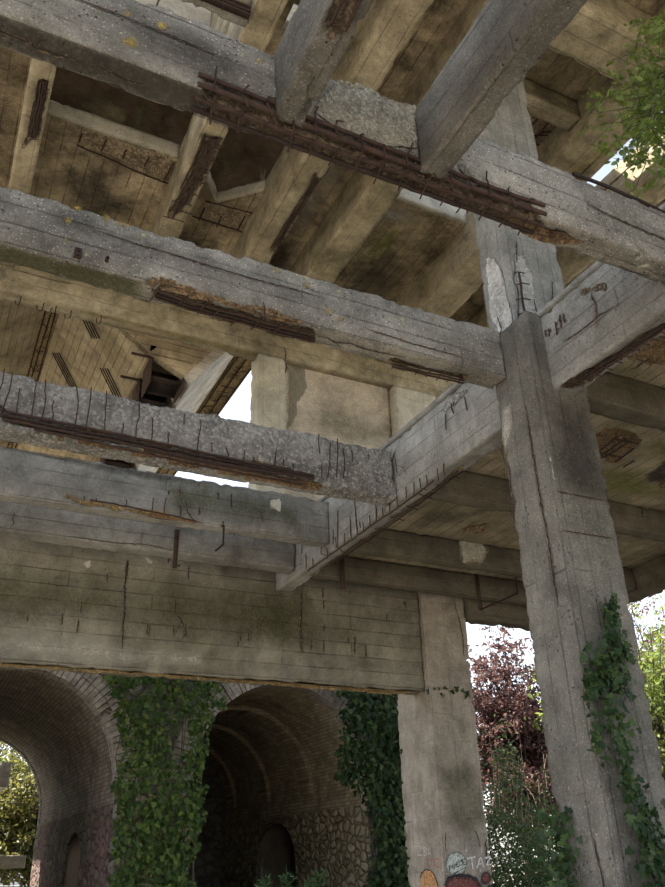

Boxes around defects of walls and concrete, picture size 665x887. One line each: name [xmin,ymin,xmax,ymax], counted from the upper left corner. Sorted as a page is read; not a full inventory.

spalling [324,0,362,40]
spalling [163,66,584,251]
spalling [146,277,316,343]
spalling [486,254,537,332]
spalling [561,323,665,389]
spalling [0,311,353,491]
spalling [596,428,642,468]
leakage [649,462,665,482]
spalling [63,495,197,523]